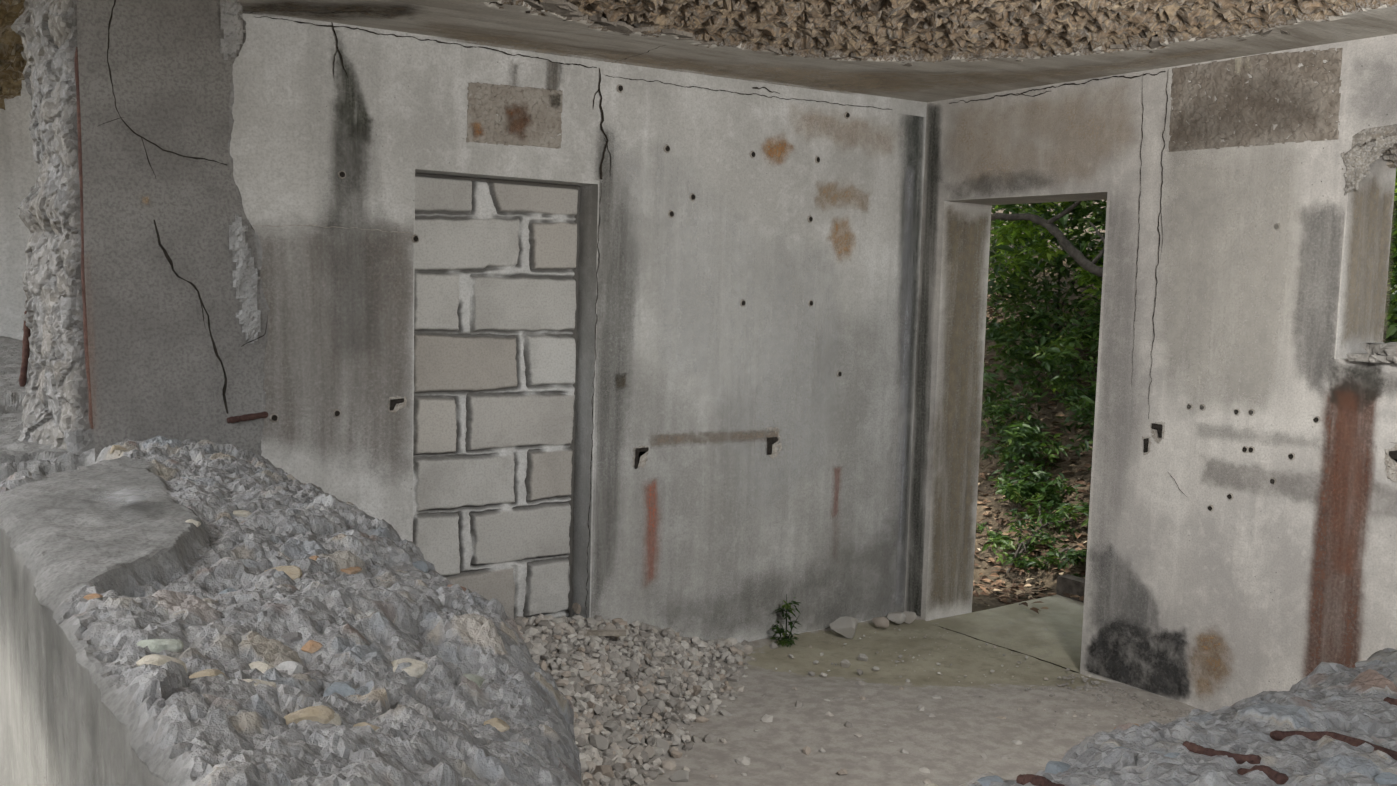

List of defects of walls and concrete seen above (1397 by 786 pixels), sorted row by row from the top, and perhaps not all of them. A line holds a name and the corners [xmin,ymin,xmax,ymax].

crack [97,0,227,177]
damp [337,50,370,163]
damp [547,63,561,106]
rust [764,141,787,162]
spalling [487,0,1397,67]
spalling [19,311,30,387]
spalling [74,47,93,429]
crack [154,220,268,414]
spalling [229,214,261,344]
damp [355,234,408,452]
rust [647,482,657,578]
rust [1305,381,1378,676]